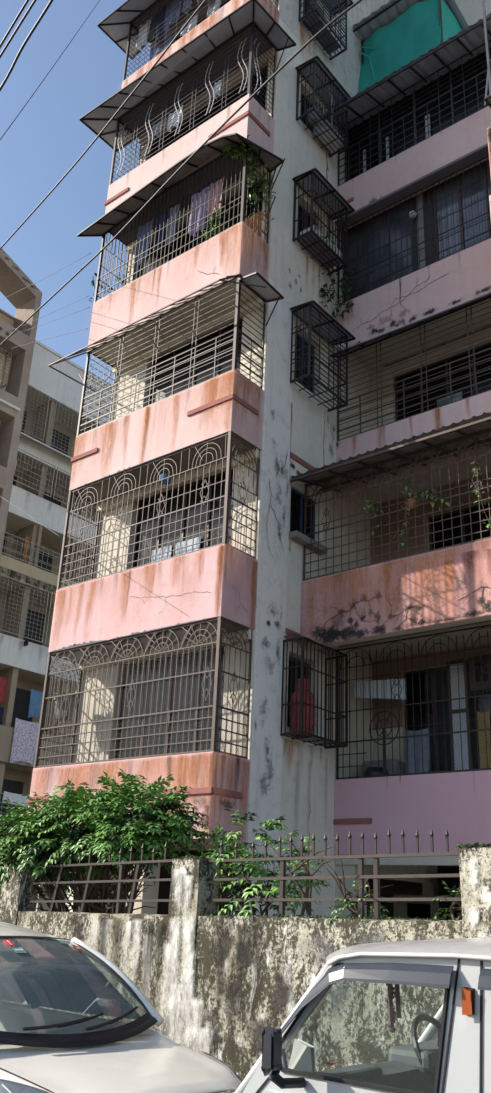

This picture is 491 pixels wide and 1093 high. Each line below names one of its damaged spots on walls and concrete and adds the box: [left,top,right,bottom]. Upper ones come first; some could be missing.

crack [353,273,449,331]
water stain [313,583,491,643]
water stain [99,917,120,953]
water stain [201,920,293,1059]